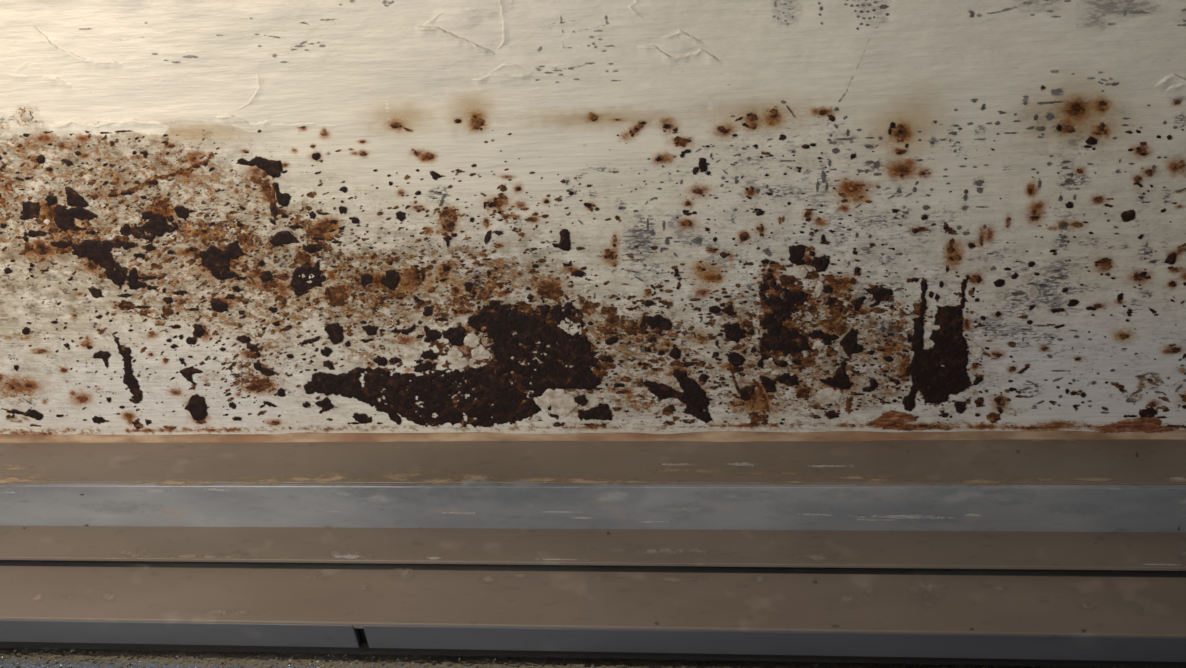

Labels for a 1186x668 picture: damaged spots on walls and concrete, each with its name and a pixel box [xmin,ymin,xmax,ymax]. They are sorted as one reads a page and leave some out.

rust [0,98,1186,435]
peeling [451,333,492,368]
peeling [525,389,583,427]